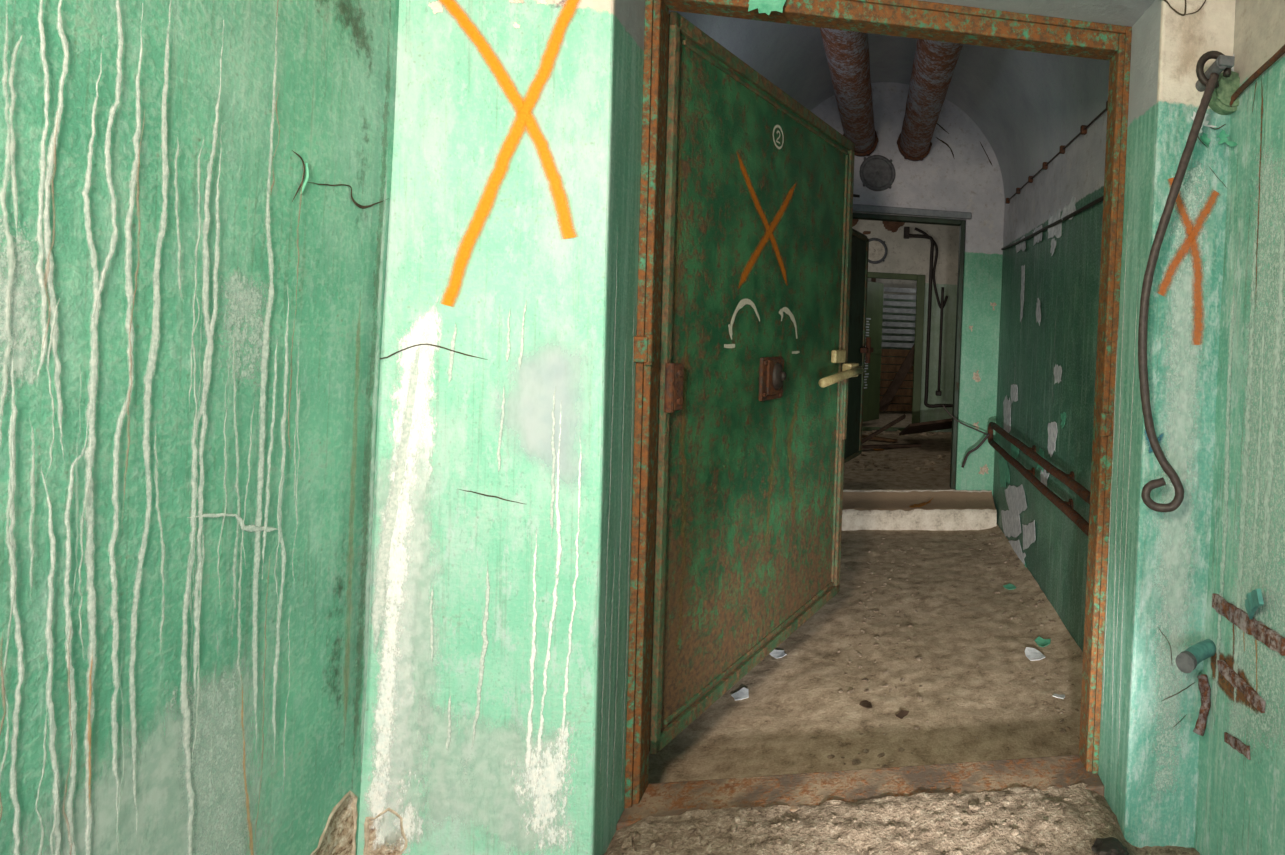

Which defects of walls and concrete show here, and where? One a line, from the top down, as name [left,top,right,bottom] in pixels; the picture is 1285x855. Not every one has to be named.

peeling [428,0,443,14]
crack [292,150,387,209]
damp [0,0,302,855]
damp [362,296,582,853]
corrosion [1211,624,1258,712]
flaking render [310,791,408,855]